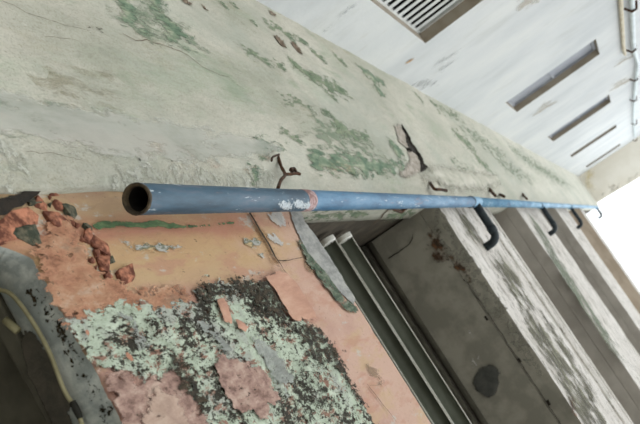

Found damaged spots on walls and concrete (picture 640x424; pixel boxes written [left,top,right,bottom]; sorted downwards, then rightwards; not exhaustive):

spalling [274,35,303,54]
peeling [111,158,275,190]
spalling [395,124,420,178]
crack [249,213,302,271]
rust [428,230,471,282]
peeling [0,193,375,424]
mould [455,208,607,424]